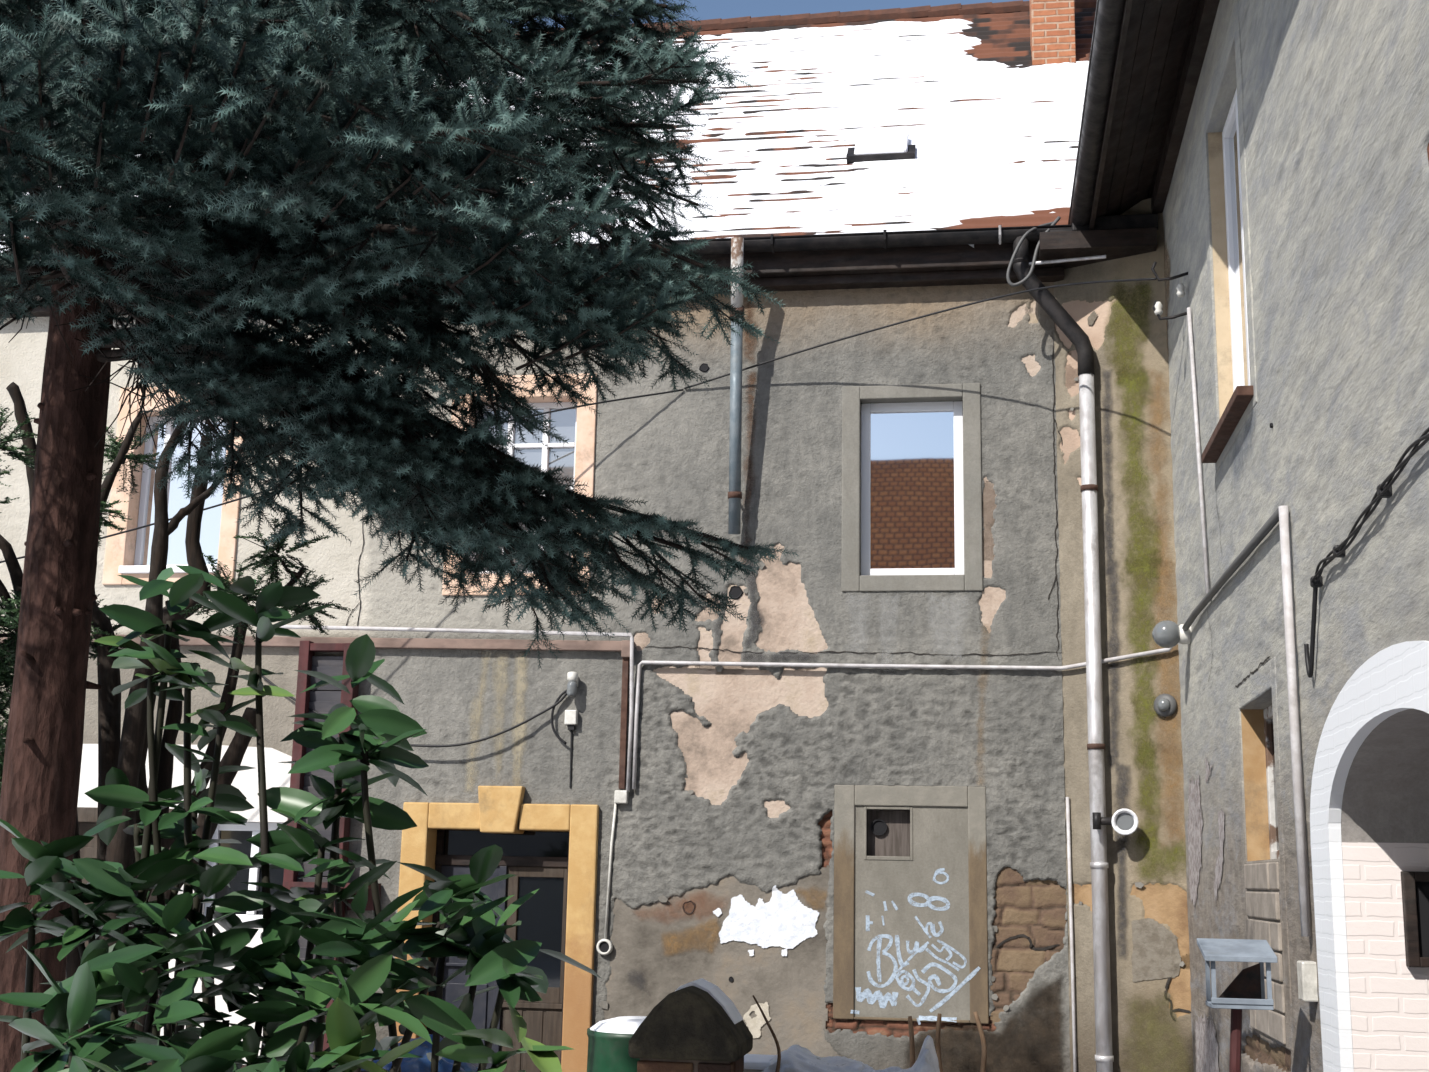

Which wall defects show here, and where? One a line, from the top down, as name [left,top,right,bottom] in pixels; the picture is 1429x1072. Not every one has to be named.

spalling [1007,300,1038,328]
spalling [1021,354,1041,377]
spalling [1055,298,1117,464]
spalling [634,632,650,651]
spalling [653,543,828,805]
spalling [978,476,1006,633]
water stain [1104,284,1186,955]
spalling [764,800,790,818]
spalling [599,811,1092,1057]
spalling [1130,757,1224,1072]